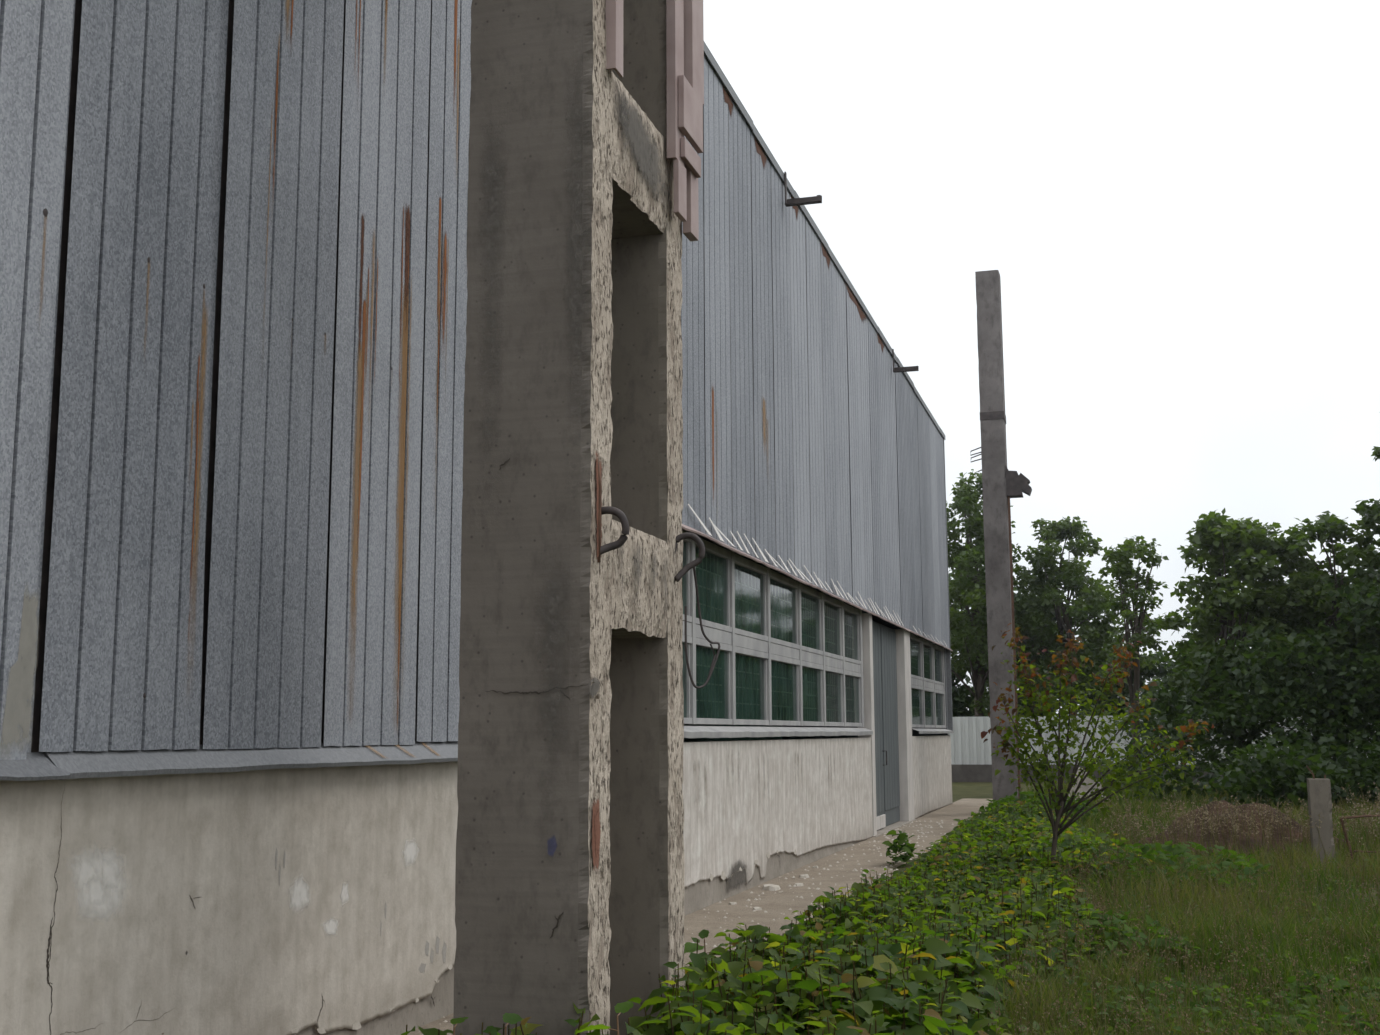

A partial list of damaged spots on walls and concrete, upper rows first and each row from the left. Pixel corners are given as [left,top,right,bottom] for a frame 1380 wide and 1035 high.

corrosion [266,0,294,259]
corrosion [190,318,207,578]
corrosion [352,215,378,614]
corrosion [397,204,412,725]
corrosion [437,198,449,415]
crack [46,789,171,1035]
flaking render [291,937,454,1035]
flaking render [684,842,853,915]